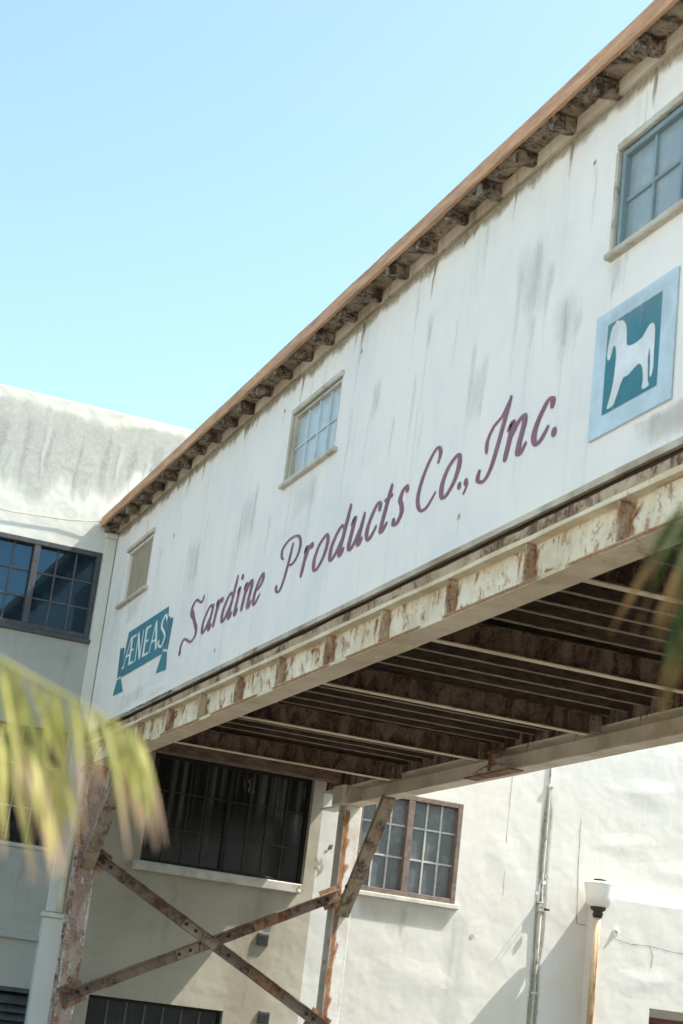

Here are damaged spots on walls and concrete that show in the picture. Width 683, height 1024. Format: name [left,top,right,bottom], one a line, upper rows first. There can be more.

rust [568,508,683,566]
rust [442,552,552,619]
rust [272,602,419,689]
rust [337,811,350,889]
rust [323,906,339,1017]